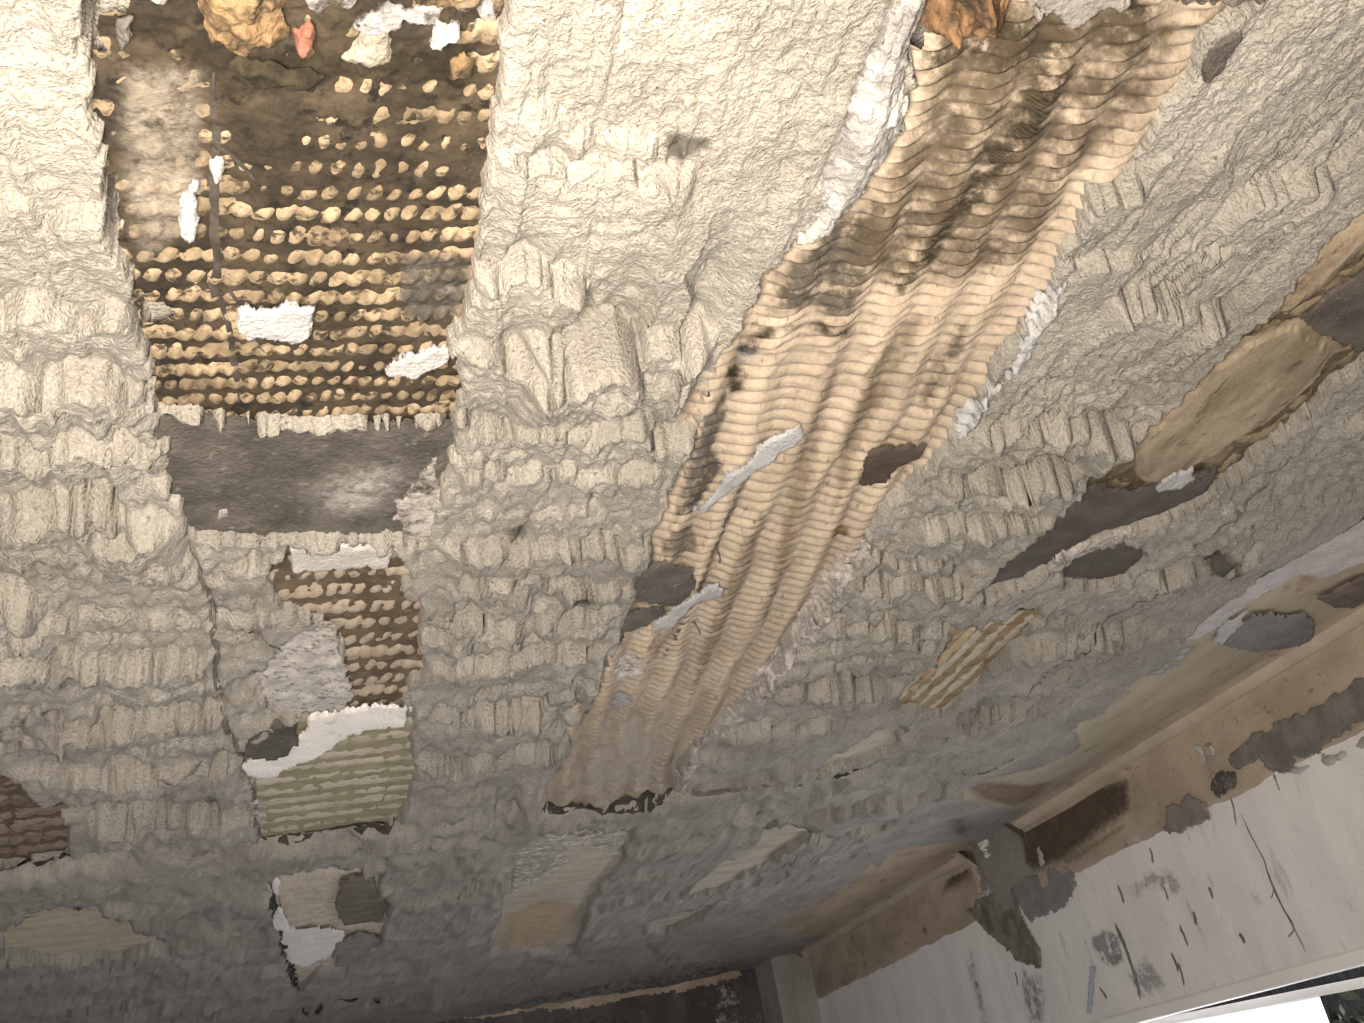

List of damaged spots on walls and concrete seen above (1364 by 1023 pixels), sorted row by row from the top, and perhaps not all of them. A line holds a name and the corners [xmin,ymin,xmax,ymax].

spalling [82,0,504,839]
spalling [545,0,1265,806]
spalling [992,213,1364,584]
crack [188,539,395,857]
spalling [962,520,1364,810]
spalling [0,776,70,862]
spalling [0,905,157,954]
crack [157,760,203,786]
spalling [264,866,389,986]
spalling [492,828,630,951]
spalling [655,810,807,926]
spalling [966,867,1077,969]